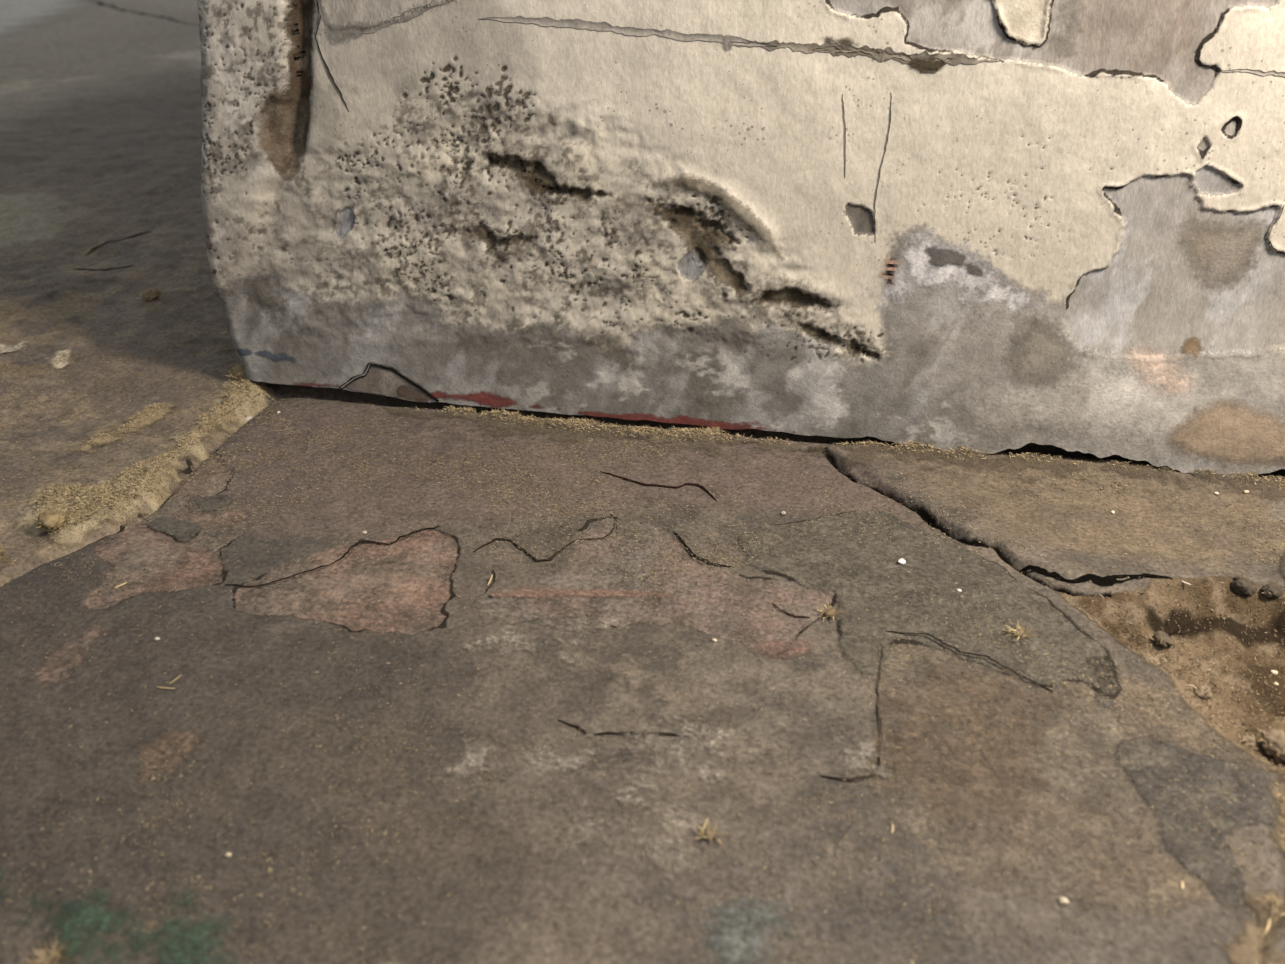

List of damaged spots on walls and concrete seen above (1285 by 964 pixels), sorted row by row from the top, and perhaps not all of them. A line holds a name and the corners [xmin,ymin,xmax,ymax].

peeling [825,0,1278,106]
flaking render [201,2,300,199]
peeling [208,57,1285,478]
crack [225,526,439,588]
crack [473,514,617,593]
crack [600,471,717,501]
crack [673,531,734,568]
crack [796,447,1173,598]
crack [772,603,810,618]
crack [557,719,690,737]
crack [820,631,1053,782]